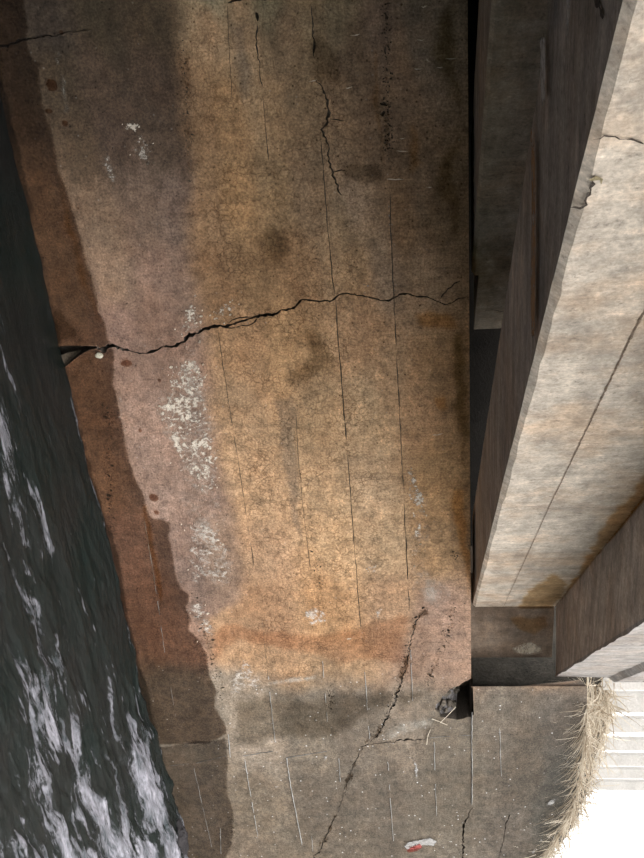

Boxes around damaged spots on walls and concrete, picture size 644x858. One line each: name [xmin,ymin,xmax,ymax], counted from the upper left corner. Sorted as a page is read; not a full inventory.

crack [309,7,317,56]
crack [316,81,345,194]
crack [97,281,466,354]
damp [78,345,144,514]
damp [157,361,219,492]
damp [181,523,227,581]
damp [126,570,212,711]
crack [313,604,434,858]
spalling [435,672,474,720]
crack [461,808,473,858]